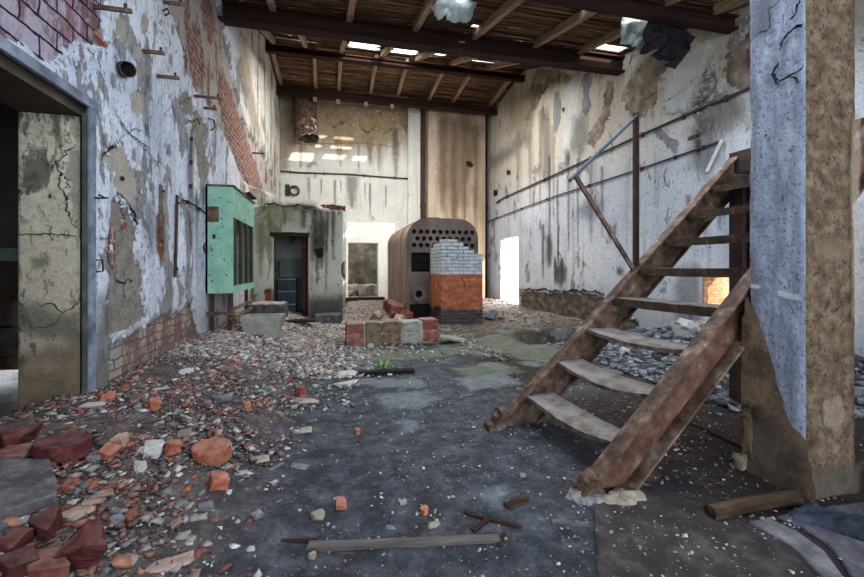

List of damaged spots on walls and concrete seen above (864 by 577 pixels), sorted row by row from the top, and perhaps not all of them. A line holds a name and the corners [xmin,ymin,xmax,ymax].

flaking render [0,0,160,67]
crack [102,101,167,176]
flaking render [168,0,274,195]
damp [562,77,579,147]
flaking render [524,51,667,148]
damp [666,41,713,112]
crack [755,0,821,86]
crack [18,147,109,241]
flaking render [102,139,199,381]
damp [258,202,335,263]
damp [542,225,565,283]
crack [34,301,80,328]